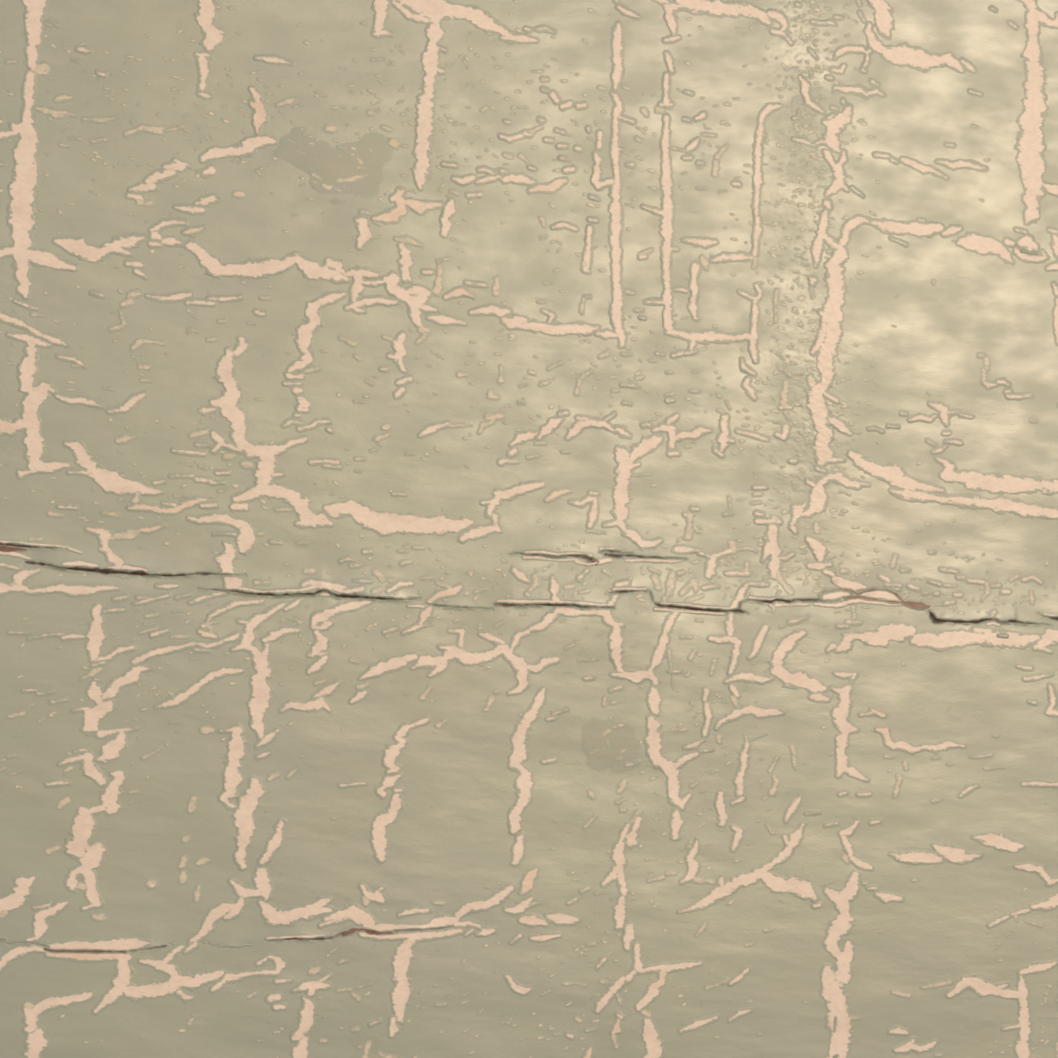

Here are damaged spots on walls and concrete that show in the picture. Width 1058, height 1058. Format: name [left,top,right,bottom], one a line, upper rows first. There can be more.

peeling [124,156,194,208]
peeling [146,190,247,249]
peeling [438,115,593,239]
peeling [871,141,989,181]
peeling [673,236,754,322]
peeling [851,399,975,455]
peeling [299,545,488,637]
crack [0,239,1058,1058]
peeling [647,559,811,661]
peeling [816,549,1045,630]
peeling [713,733,768,854]
peeling [334,925,399,938]